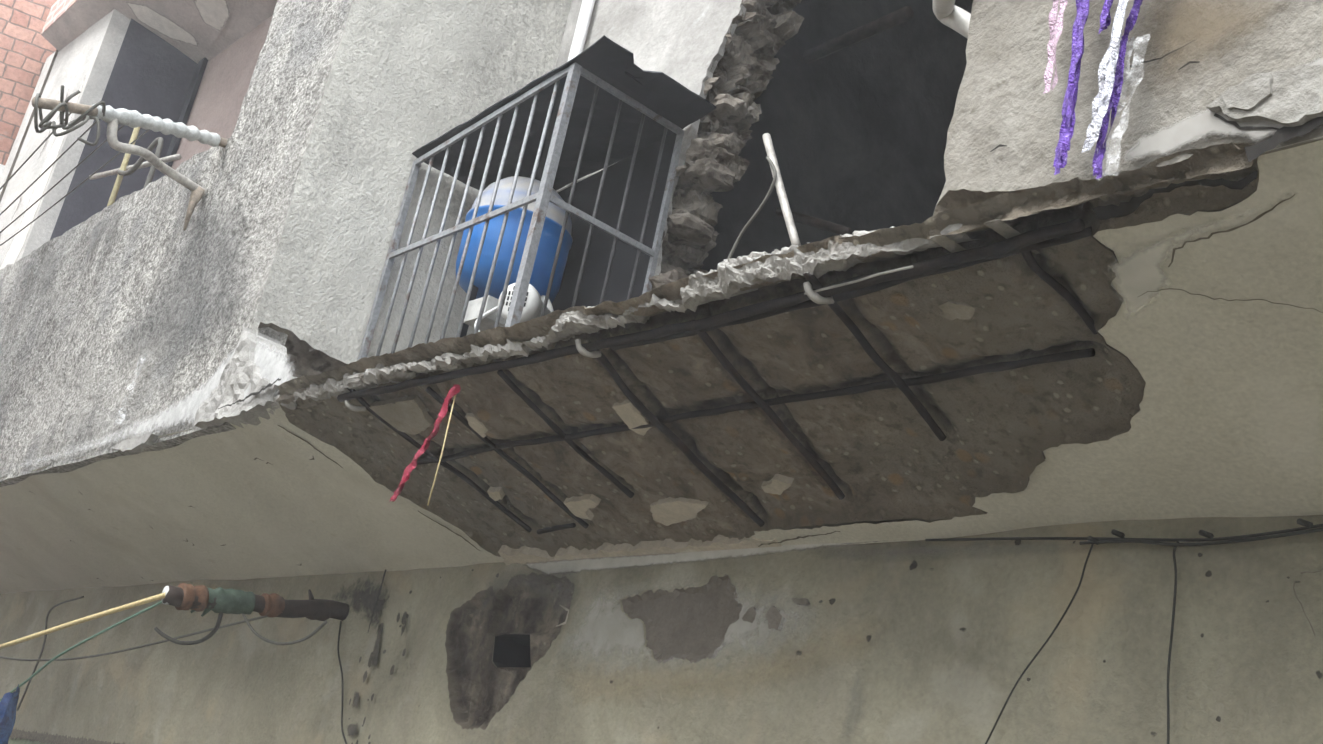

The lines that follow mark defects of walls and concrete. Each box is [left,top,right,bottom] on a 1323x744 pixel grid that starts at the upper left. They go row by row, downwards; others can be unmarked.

peeling [127,3,197,46]
crack [1214,113,1323,162]
crack [1138,194,1323,313]
spalling [193,0,1259,730]